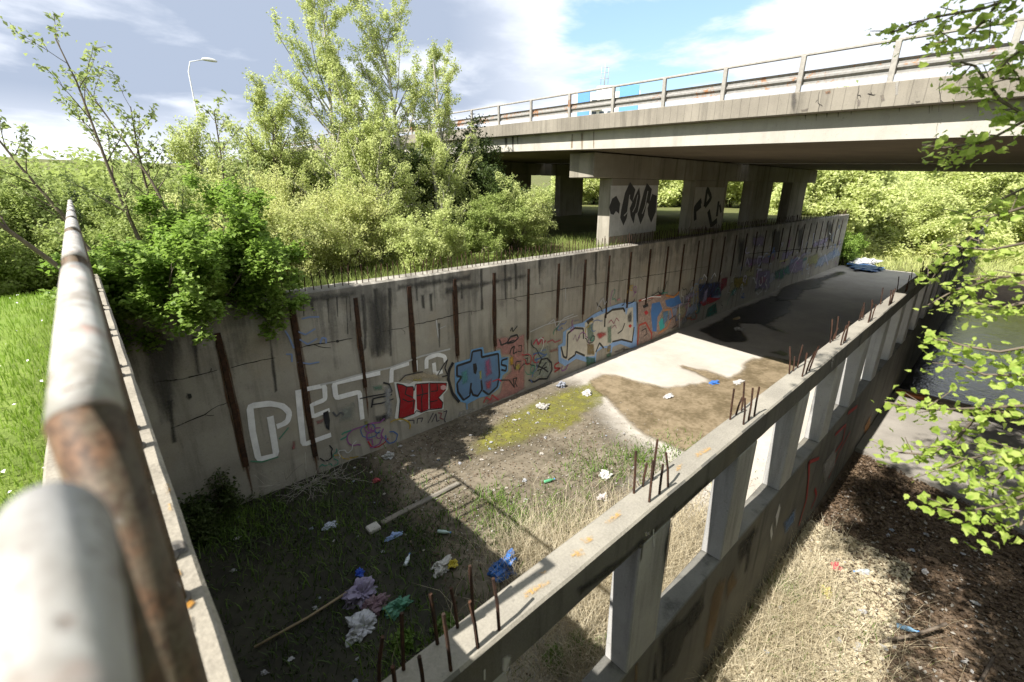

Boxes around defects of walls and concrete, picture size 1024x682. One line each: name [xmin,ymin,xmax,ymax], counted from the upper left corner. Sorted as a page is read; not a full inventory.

damp [291,263,525,355]
crack [174,402,228,428]
crack [159,358,272,382]
corrosion [290,315,315,440]